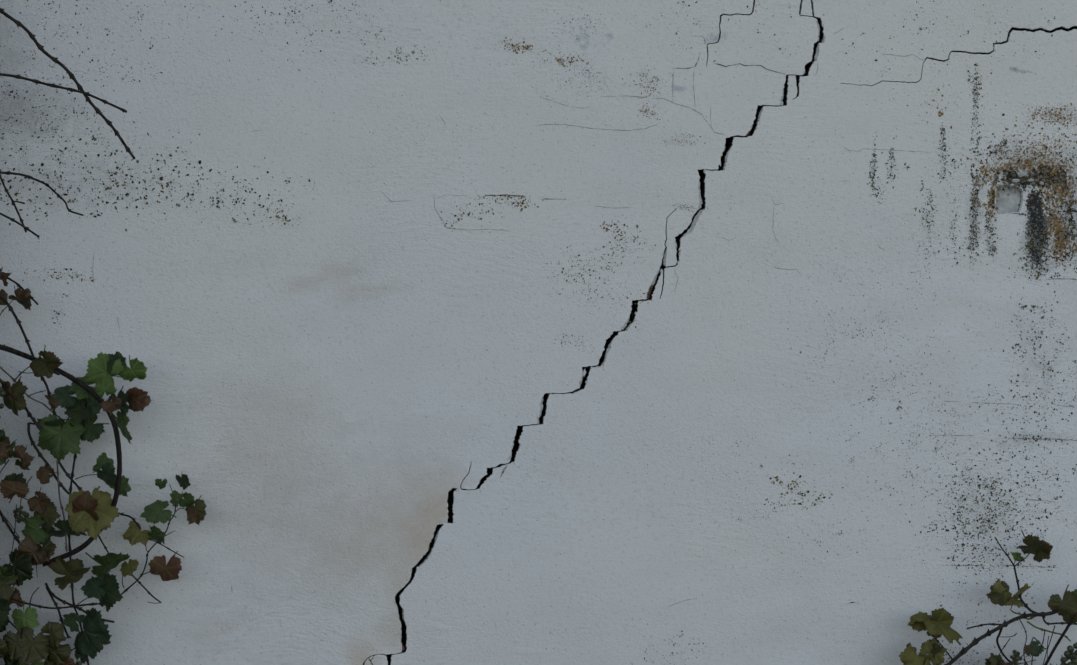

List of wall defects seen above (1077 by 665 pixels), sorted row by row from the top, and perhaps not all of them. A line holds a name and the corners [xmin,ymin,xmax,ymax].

leakage [0,0,318,231]
leakage [212,0,385,61]
crack [841,26,1077,86]
rust [955,103,1077,267]
crack [363,0,842,665]
leakage [787,55,1077,665]